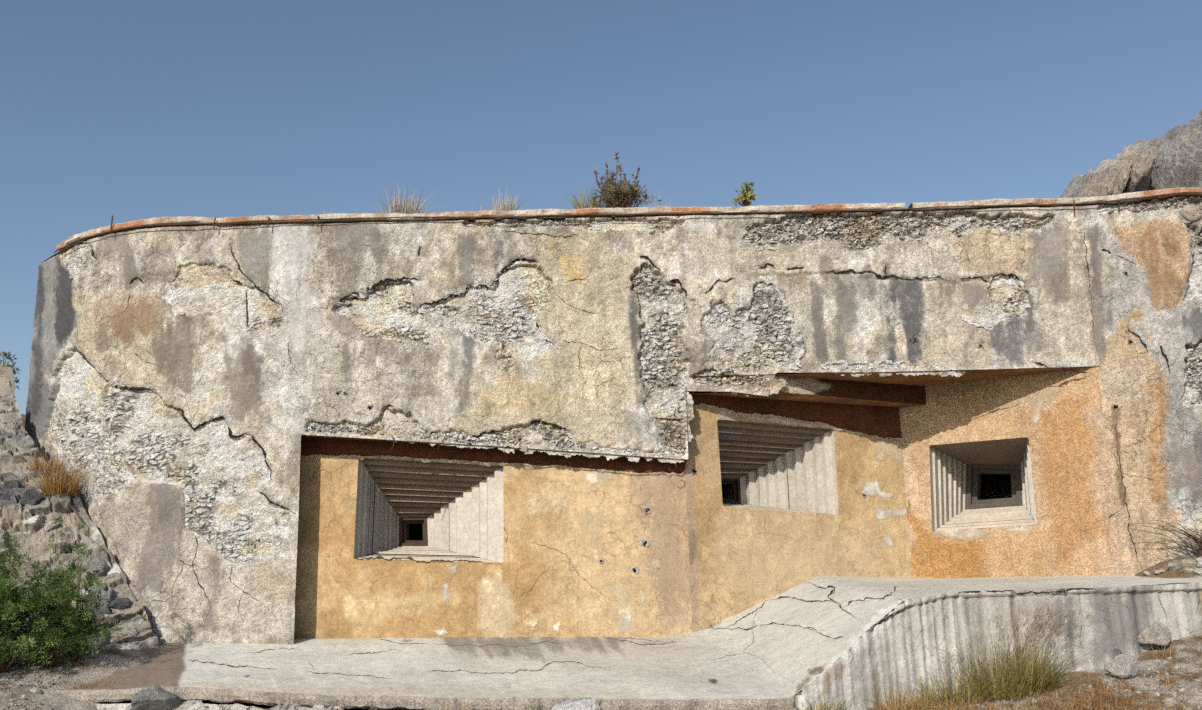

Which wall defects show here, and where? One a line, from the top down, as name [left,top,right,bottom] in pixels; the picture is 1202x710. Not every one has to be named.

crack [97,277,143,323]
crack [229,243,284,313]
leakage [811,264,924,363]
spalling [742,211,1053,252]
spalling [960,275,1031,330]
spalling [1183,225,1202,313]
spalling [306,260,817,484]
spalling [1181,340,1202,408]
spalling [47,347,292,564]
crack [57,349,296,514]
leakage [137,483,183,591]
crack [170,528,669,678]